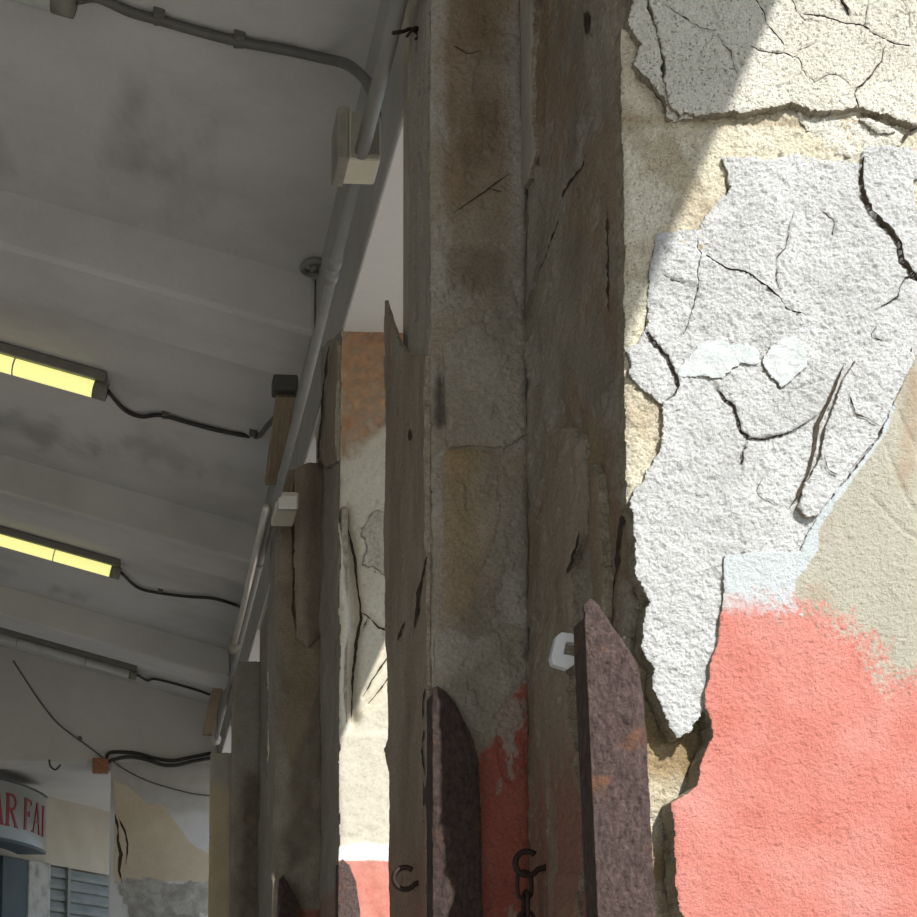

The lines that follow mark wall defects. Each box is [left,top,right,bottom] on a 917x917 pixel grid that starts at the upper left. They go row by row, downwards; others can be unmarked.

crack [664,0,910,108]
crack [453,174,509,213]
crack [662,217,805,332]
crack [859,157,917,341]
crack [647,332,680,399]
flaking render [614,0,917,917]
crack [719,365,880,509]
peeling [361,300,528,917]
crack [115,815,129,883]
peeling [113,781,209,917]